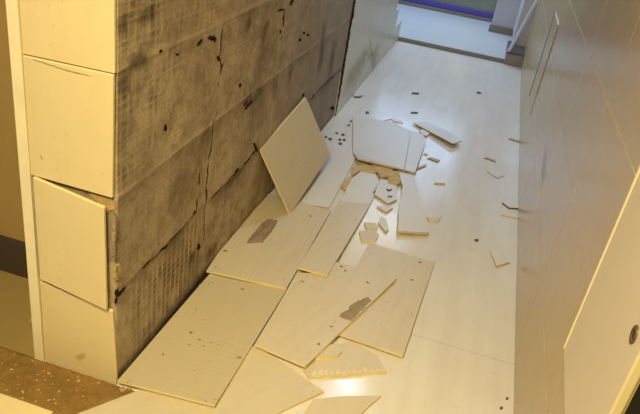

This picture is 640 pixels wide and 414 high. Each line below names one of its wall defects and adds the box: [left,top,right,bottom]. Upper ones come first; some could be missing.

crack [216,28,224,85]
crack [141,119,259,269]